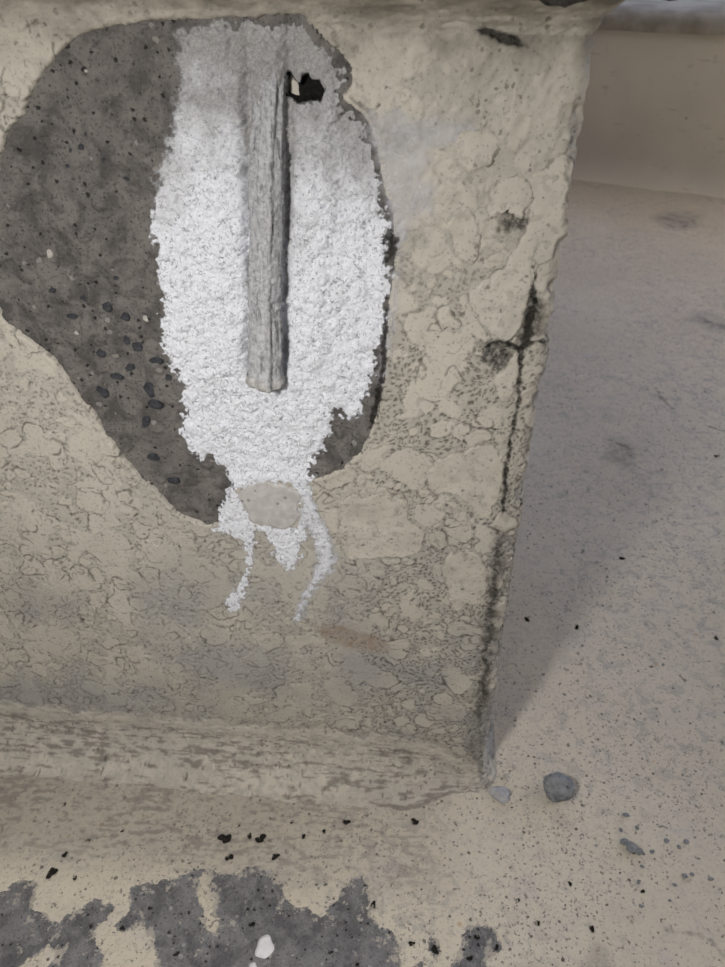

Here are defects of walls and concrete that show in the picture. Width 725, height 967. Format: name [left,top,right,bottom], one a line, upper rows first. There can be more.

spalling [0,14,398,529]
damp [149,18,421,621]
crack [487,259,546,512]
peeling [0,853,442,967]
spalling [217,824,240,861]
peeling [451,924,502,967]